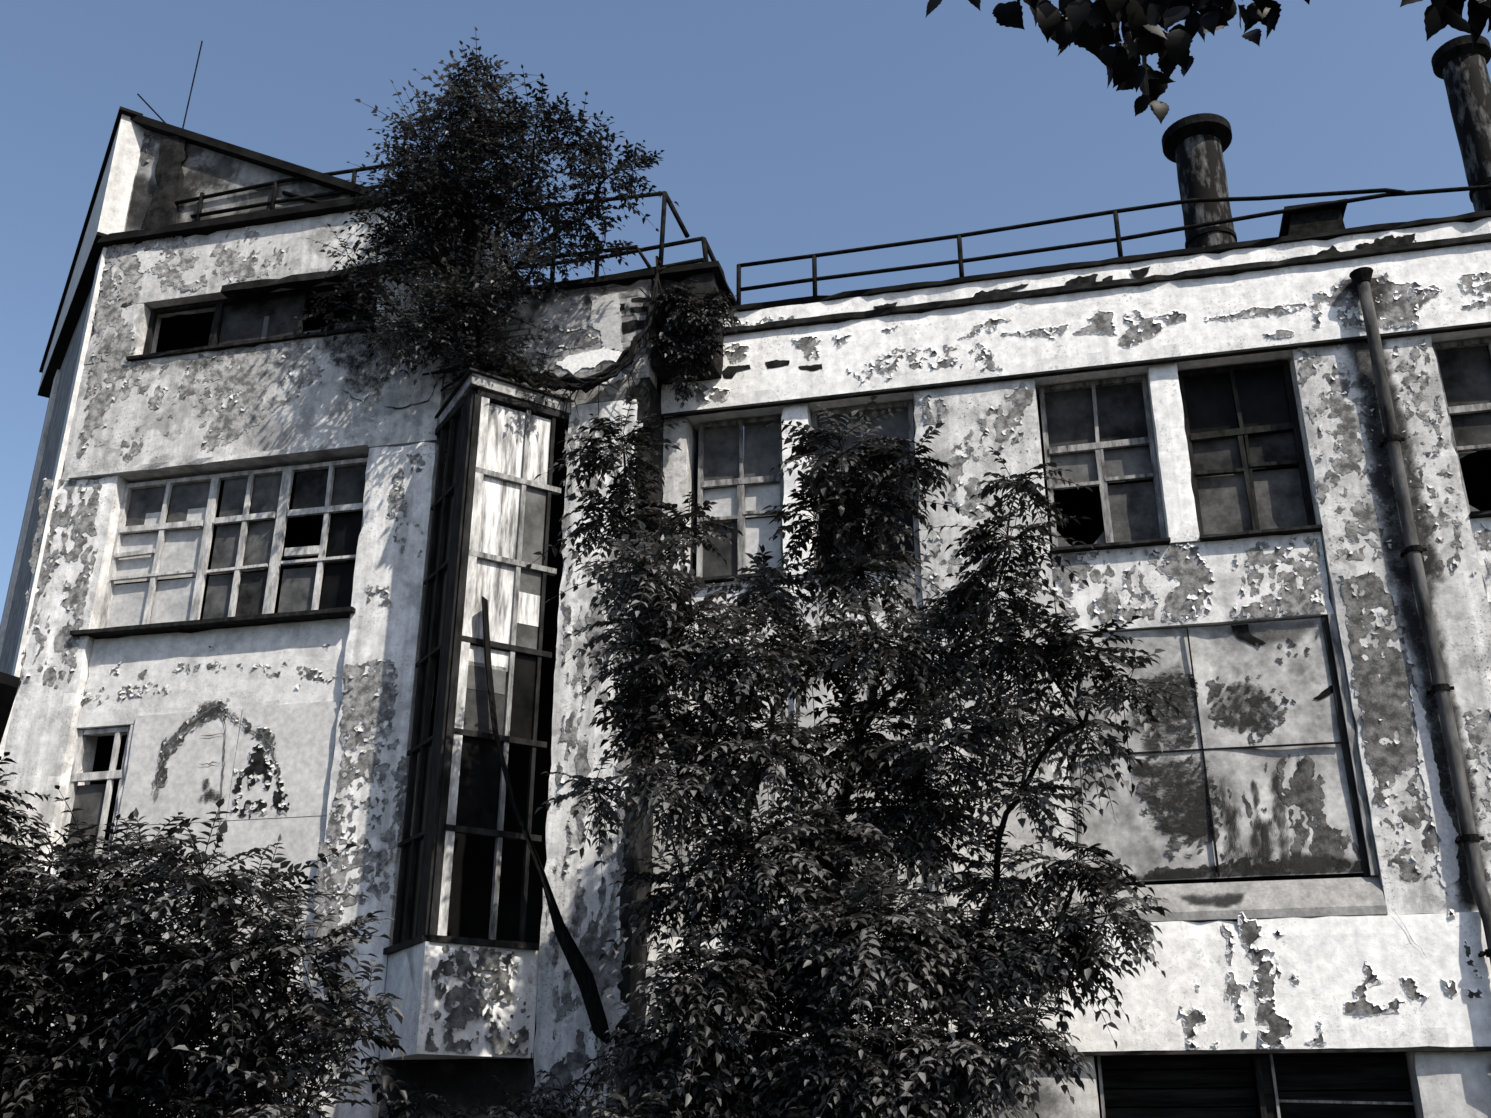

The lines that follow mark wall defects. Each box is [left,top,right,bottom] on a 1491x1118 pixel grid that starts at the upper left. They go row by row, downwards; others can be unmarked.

peeling [76,227,324,462]
peeling [689,383,731,405]
peeling [723,315,795,364]
peeling [791,332,852,360]
peeling [387,452,425,557]
peeling [711,532,1216,649]
peeling [846,271,1491,884]
peeling [20,478,408,1001]
peeling [425,417,633,1118]
peeling [1178,984,1220,1050]
peeling [1221,912,1327,1049]
peeling [1343,940,1485,1017]